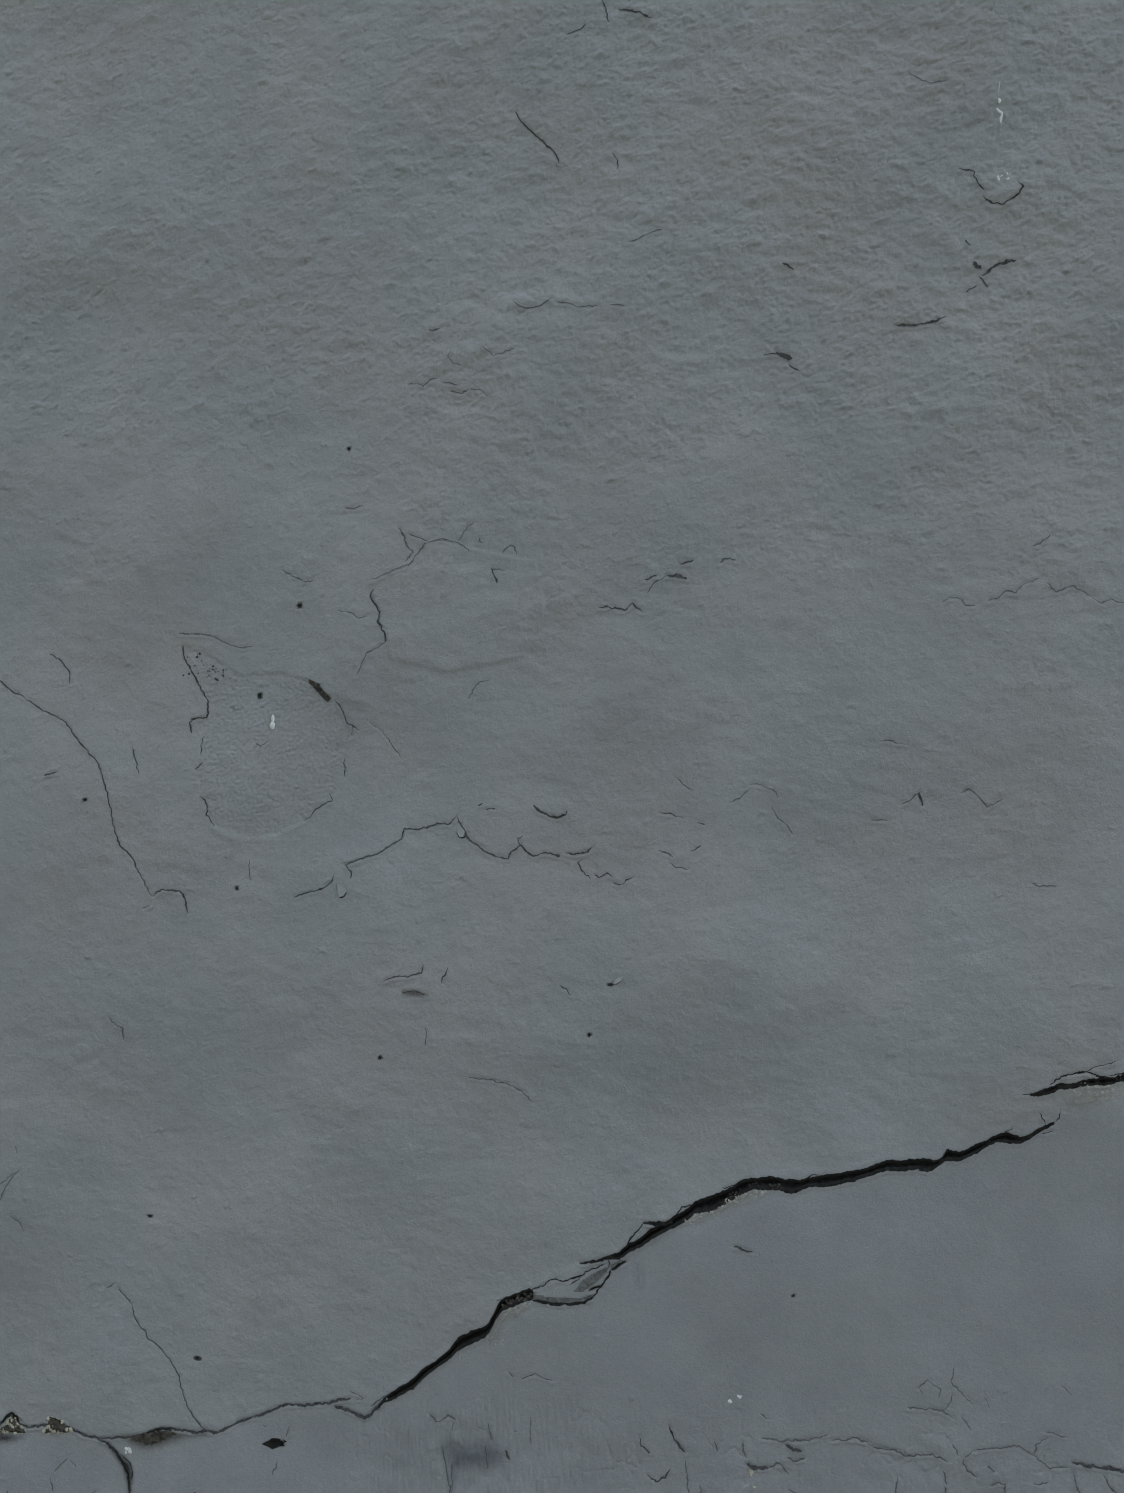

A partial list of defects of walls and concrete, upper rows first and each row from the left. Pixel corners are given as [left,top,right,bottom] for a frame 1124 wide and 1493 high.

crack [0,680,188,913]
crack [179,633,252,827]
crack [305,523,517,820]
crack [295,803,633,897]
crack [659,777,793,870]
crack [0,1061,1124,1493]